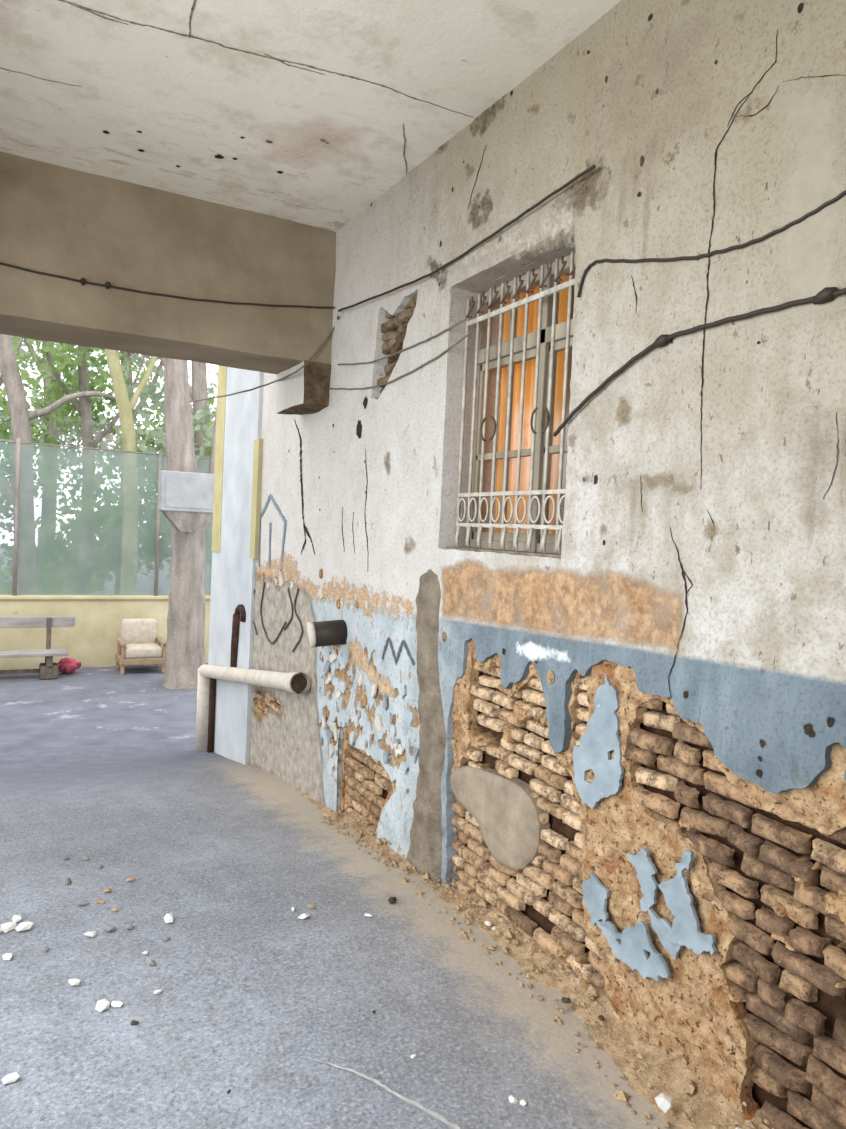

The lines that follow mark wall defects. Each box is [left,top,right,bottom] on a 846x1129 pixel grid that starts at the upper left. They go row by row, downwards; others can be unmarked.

crack [0,68,81,87]
crack [58,0,472,173]
spalling [377,295,417,394]
peeling [255,553,415,620]
crack [668,528,692,698]
spalling [253,689,283,725]
spalling [320,644,420,827]
spalling [451,640,846,1129]